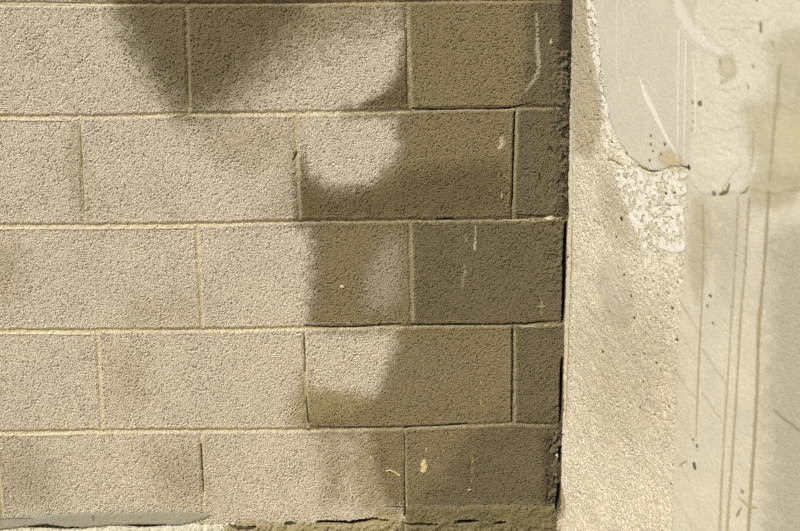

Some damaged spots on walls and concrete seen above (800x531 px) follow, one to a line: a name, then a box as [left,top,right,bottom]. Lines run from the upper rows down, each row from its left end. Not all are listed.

crack [405,30,545,217]
peeling [581,0,690,279]
crack [306,397,467,526]